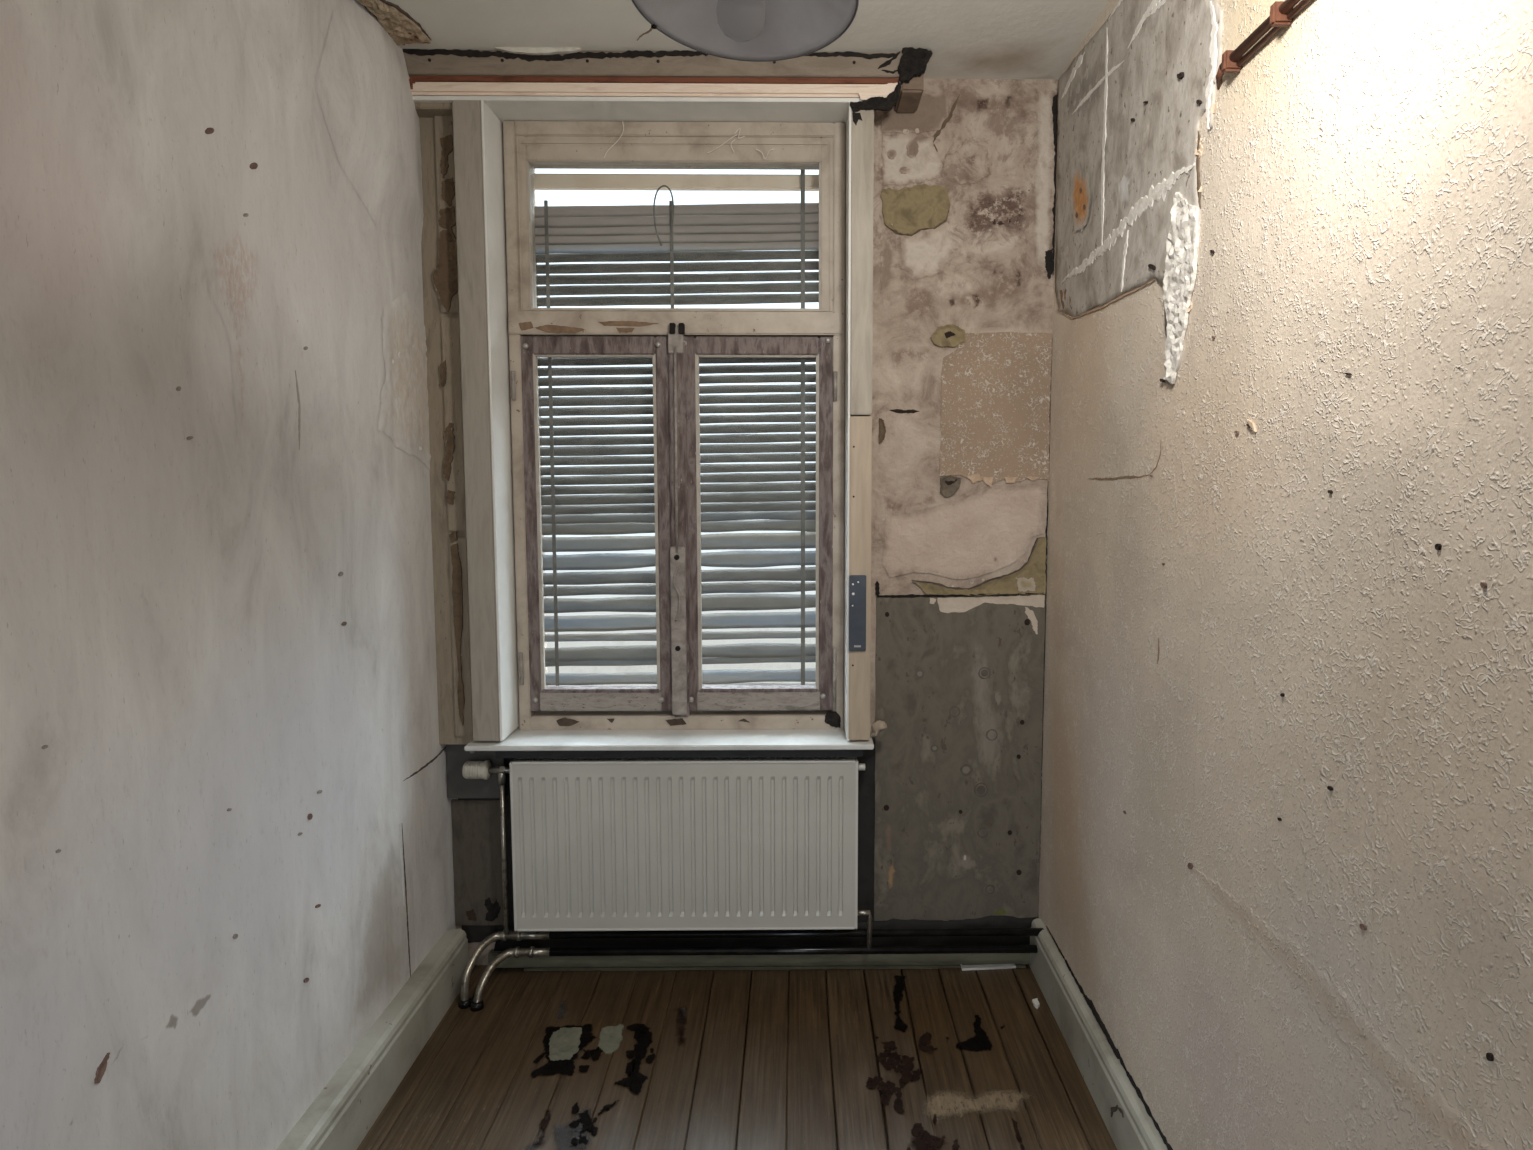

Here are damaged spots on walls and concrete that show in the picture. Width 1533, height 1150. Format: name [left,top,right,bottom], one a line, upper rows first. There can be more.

spalling [358,0,431,45]
crack [403,28,709,62]
crack [805,51,895,59]
leakage [929,29,1081,134]
spalling [880,92,958,294]
flaking render [1033,0,1223,386]
leakage [882,139,1034,375]
spalling [930,324,966,347]
peeling [882,475,1046,634]